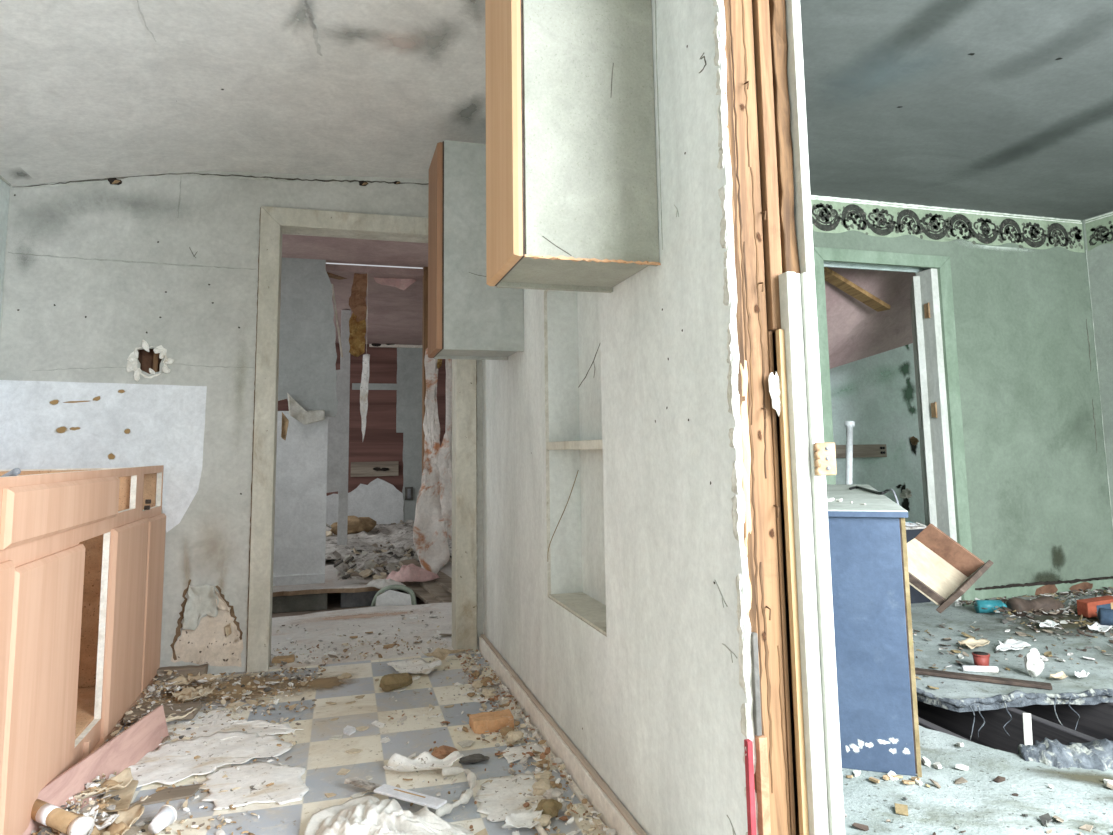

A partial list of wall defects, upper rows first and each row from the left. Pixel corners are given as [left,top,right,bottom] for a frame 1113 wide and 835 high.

spalling [126,340,174,382]
water stain [1034,547,1064,583]
flaking render [170,579,243,667]